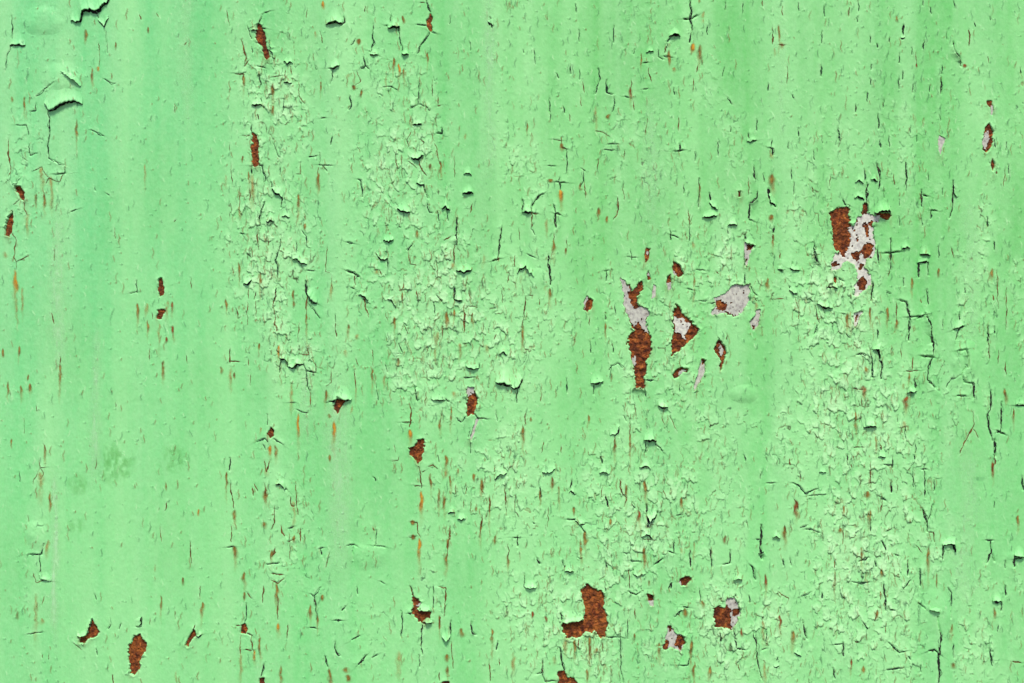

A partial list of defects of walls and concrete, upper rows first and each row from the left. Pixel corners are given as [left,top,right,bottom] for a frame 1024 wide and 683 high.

peeling [69,0,109,27]
peeling [44,70,83,112]
crack [227,0,1018,471]
rust [828,203,891,294]
rust [620,248,652,388]
rust [669,305,703,379]
rust [409,430,428,464]
crack [394,389,542,488]
rust [410,587,440,627]
rust [561,584,611,652]
rust [701,596,743,635]
rust [124,634,147,675]